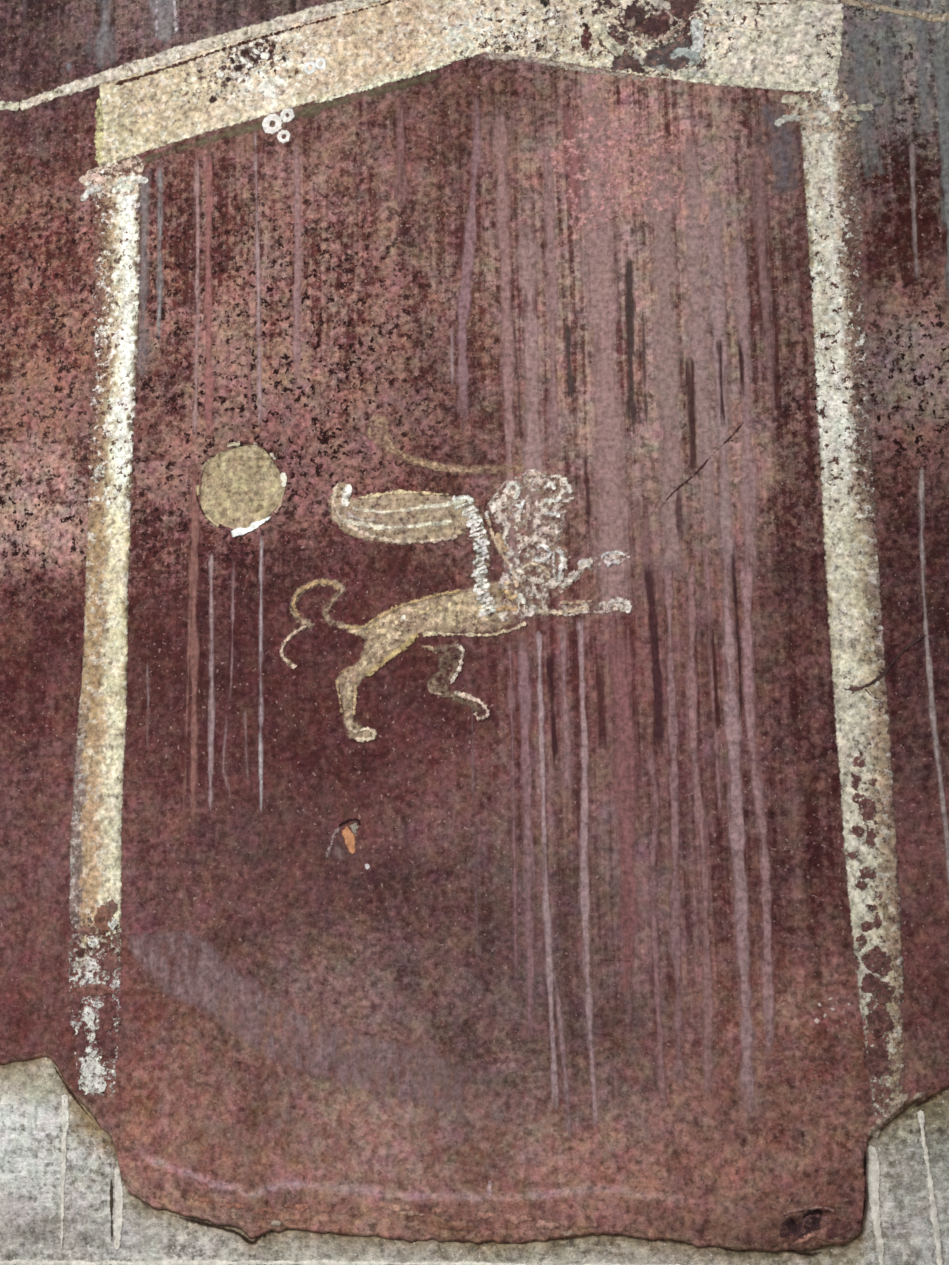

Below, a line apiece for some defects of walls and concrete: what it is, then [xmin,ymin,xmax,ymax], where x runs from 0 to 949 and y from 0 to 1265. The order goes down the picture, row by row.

peeling [579,0,724,77]
spalling [325,818,360,859]
peeling [845,756,895,1079]
spalling [0,899,949,1265]